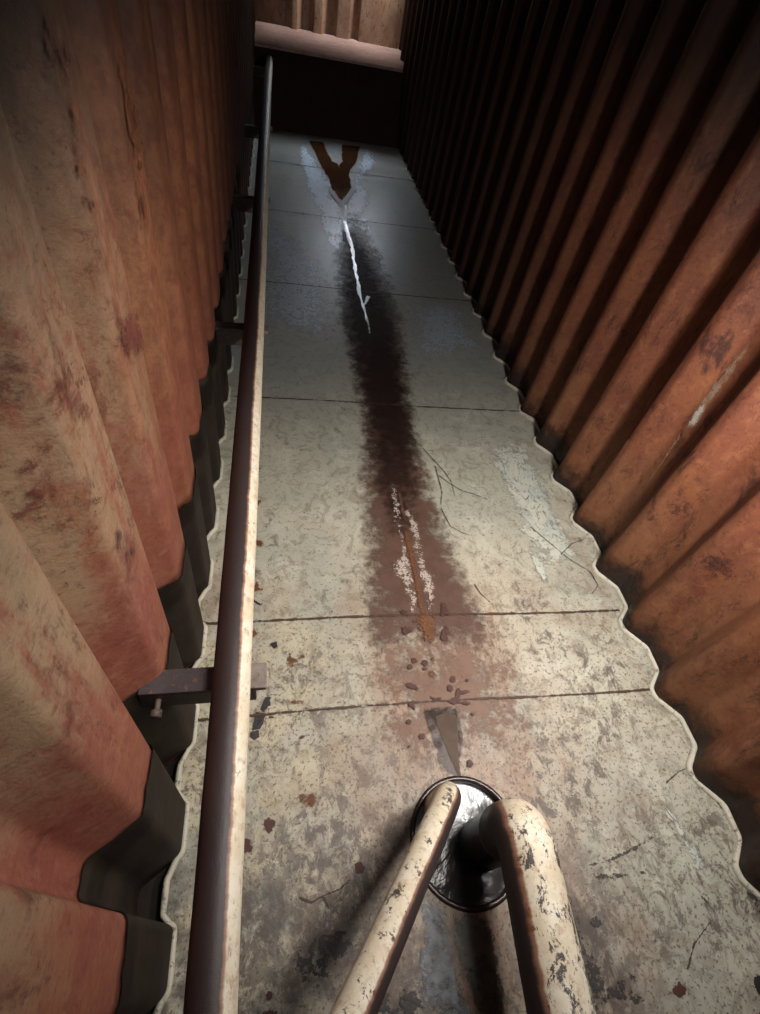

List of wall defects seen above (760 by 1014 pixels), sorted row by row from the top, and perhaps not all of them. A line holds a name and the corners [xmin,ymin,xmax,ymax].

water stain [264,144,530,776]
crack [423,448,486,534]
crack [531,527,598,594]
corrosion [400,531,451,677]
corrosion [405,682,419,724]
corrosion [430,676,475,715]